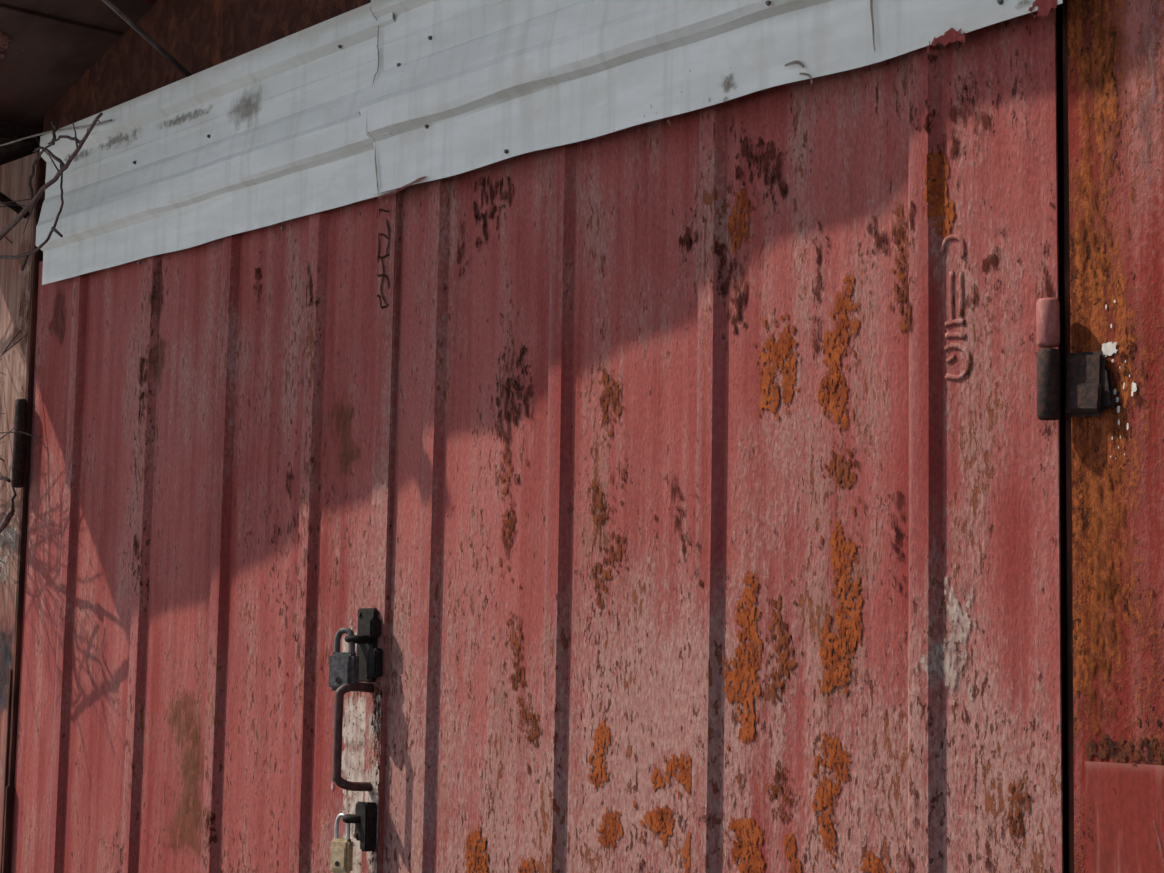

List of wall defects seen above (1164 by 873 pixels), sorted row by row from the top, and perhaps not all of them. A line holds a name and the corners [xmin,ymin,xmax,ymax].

rust [921,150,955,239]
rust [753,290,799,420]
rust [494,331,534,589]
rust [817,271,863,698]
rust [497,607,541,748]
rust [721,567,797,751]
peeling [920,564,976,705]
peeling [331,689,382,873]
rust [588,717,617,790]
rust [596,748,691,873]
rust [725,808,766,873]
rust [812,732,851,869]